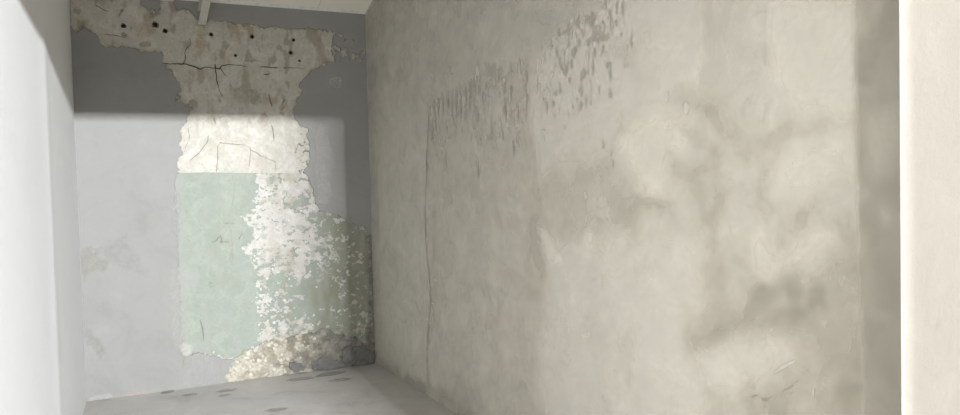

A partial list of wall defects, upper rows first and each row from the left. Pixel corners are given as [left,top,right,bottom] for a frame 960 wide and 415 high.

peeling [70,0,375,384]
crack [163,38,304,262]
crack [425,109,435,378]
damp [535,0,698,170]
damp [745,259,867,415]